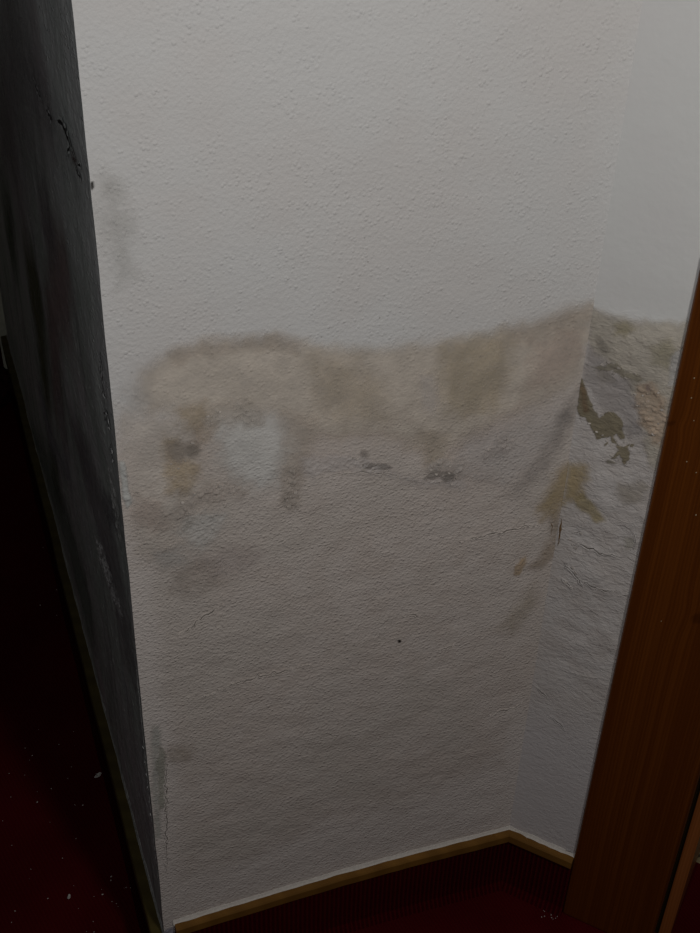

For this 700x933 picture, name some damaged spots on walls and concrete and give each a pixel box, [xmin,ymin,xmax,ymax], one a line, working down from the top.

water stain [123,305,688,562]
flaking render [577,378,634,464]